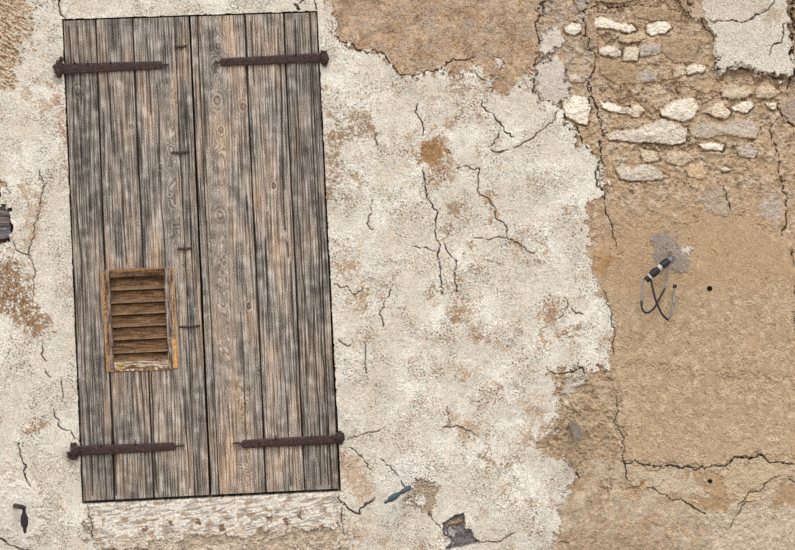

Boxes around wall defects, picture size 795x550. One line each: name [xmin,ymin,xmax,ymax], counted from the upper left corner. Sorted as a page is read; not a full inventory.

flaking render [0,0,35,91]
crack [334,36,483,80]
crack [483,1,628,237]
flaking render [326,0,795,194]
crack [687,0,795,266]
crack [414,172,458,292]
crack [457,166,533,254]
crack [613,401,795,525]
spalling [443,513,478,549]